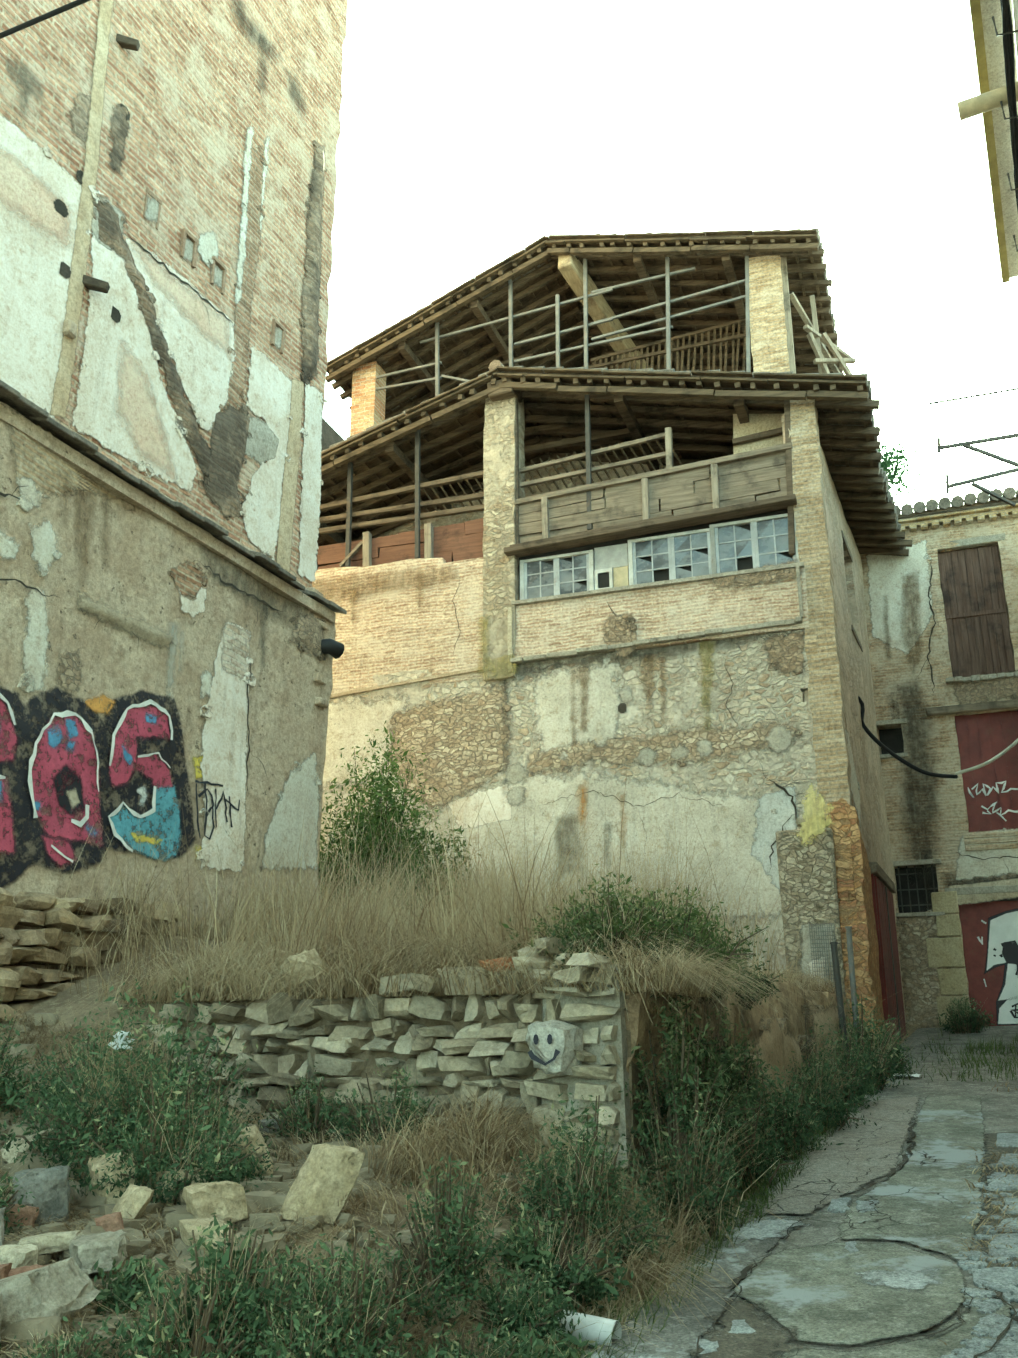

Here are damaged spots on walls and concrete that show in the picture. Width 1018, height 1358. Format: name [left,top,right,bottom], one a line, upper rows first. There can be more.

spalling [109,103,130,176]
flaking render [0,115,328,582]
crack [0,579,57,597]
flaking render [0,477,81,695]
flaking render [170,560,208,618]
flaking render [866,540,933,654]
crack [918,562,940,691]
flaking render [196,622,256,872]
flaking render [262,690,409,871]
flaking render [404,613,798,923]
crack [761,765,805,863]
damp [892,686,935,875]